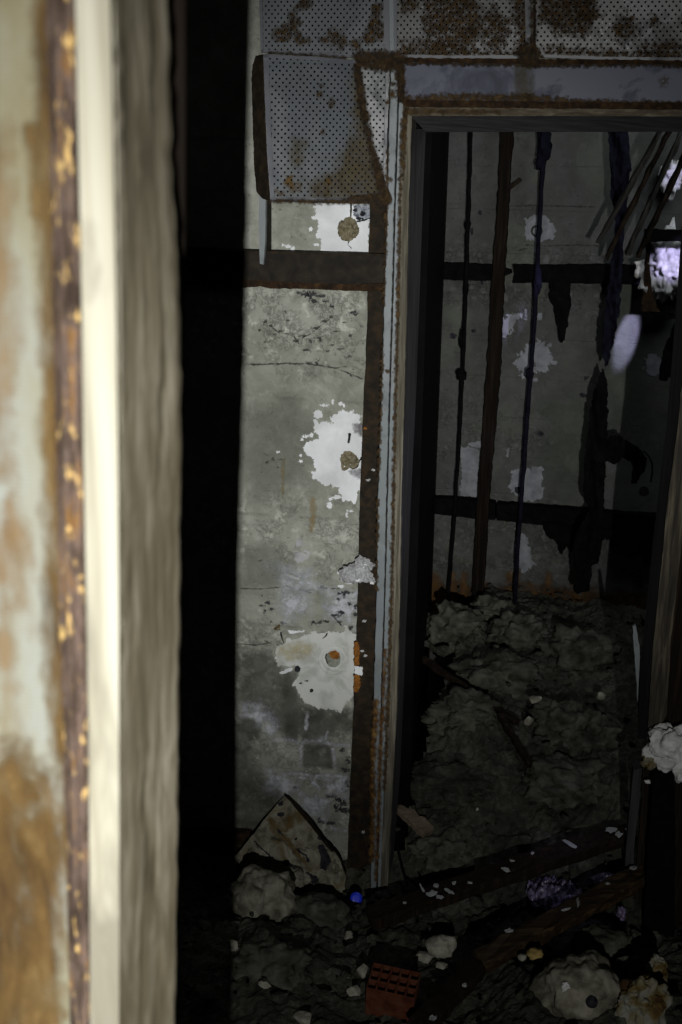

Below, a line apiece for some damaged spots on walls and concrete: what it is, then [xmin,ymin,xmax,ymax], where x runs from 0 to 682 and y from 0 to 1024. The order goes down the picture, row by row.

corrosion [24,0,52,256]
spalling [352,204,370,220]
corrosion [42,361,65,763]
peeling [313,399,345,419]
corrosion [268,0,682,881]